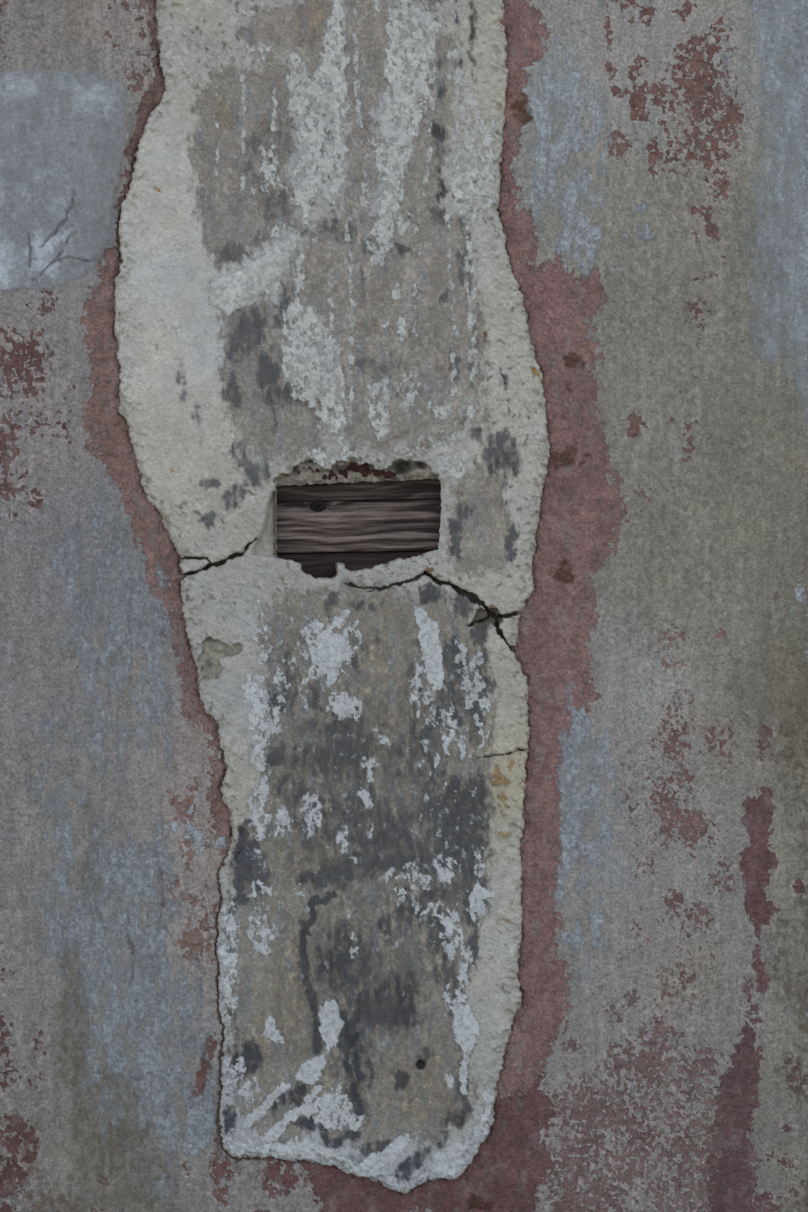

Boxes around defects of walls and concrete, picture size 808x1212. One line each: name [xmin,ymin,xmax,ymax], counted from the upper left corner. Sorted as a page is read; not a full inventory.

peeling [104,0,165,228]
damp [749,0,808,414]
crack [345,571,519,651]
peeling [254,0,808,1212]
damp [788,581,808,616]
peeling [189,1032,217,1109]
peeling [208,1136,237,1212]